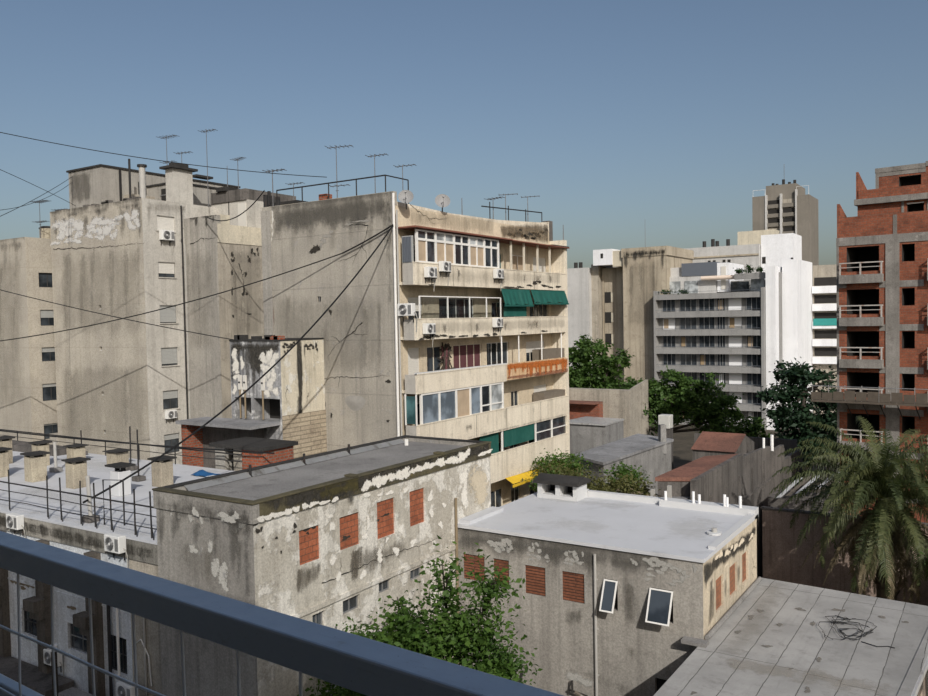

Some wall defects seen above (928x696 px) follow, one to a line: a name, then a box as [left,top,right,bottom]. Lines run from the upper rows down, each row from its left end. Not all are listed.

damp [273,194,387,228]
damp [502,225,548,241]
peeling [231,348,245,396]
peeling [259,341,318,398]
crack [324,323,384,386]
peeling [361,448,493,509]
peeling [427,489,446,529]
damp [24,523,102,547]
peeling [377,537,399,563]
peeling [487,538,513,553]
peeling [563,550,584,565]
peeling [715,533,754,568]